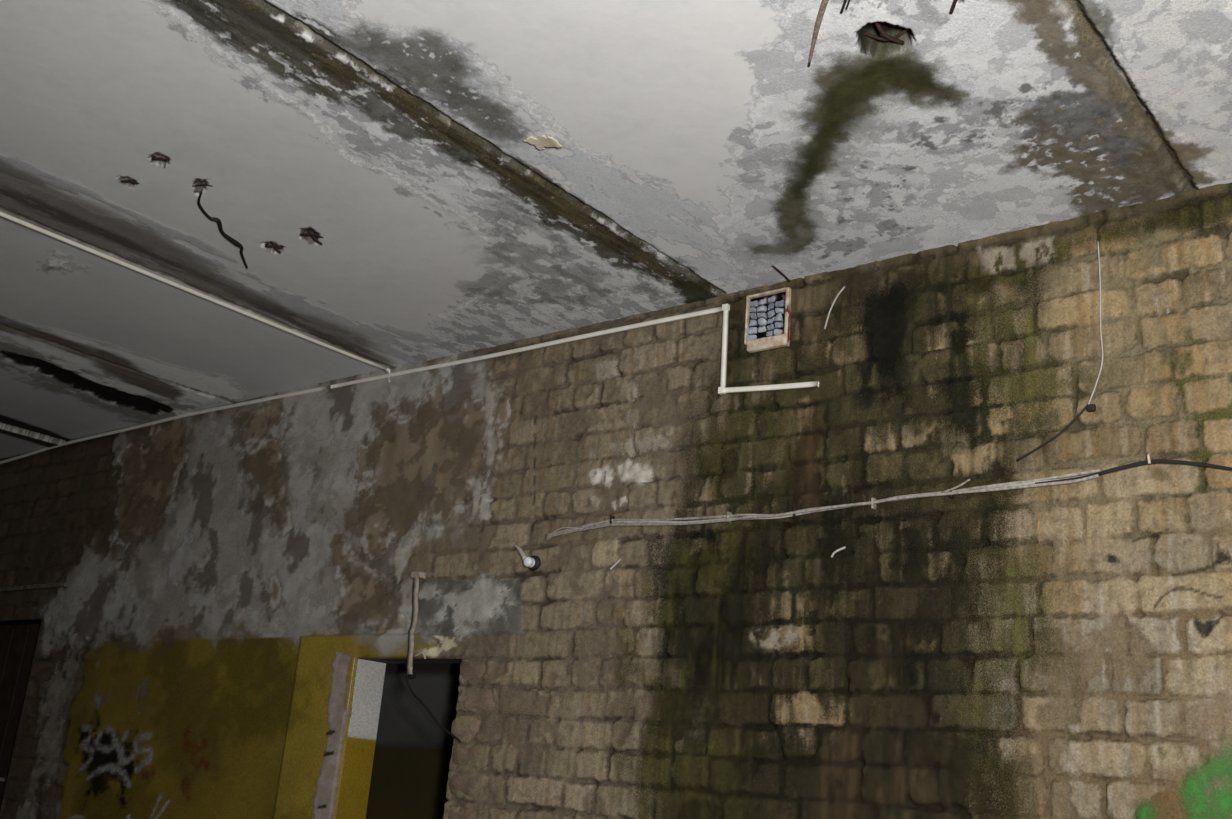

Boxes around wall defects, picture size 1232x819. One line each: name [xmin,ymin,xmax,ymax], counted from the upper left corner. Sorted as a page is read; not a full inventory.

leakage [175,0,686,282]
peeling [0,0,1232,364]
peeling [0,321,293,571]
leakage [622,0,1232,819]